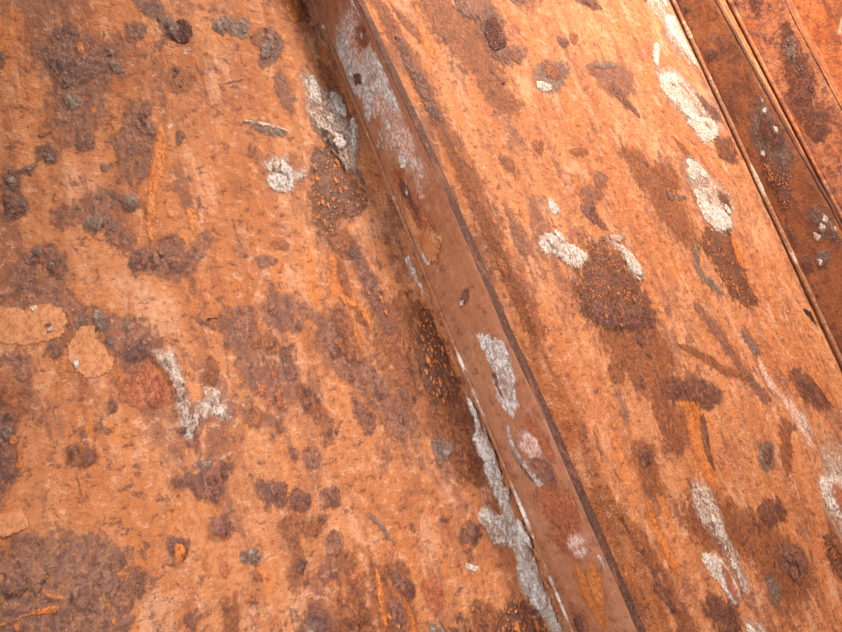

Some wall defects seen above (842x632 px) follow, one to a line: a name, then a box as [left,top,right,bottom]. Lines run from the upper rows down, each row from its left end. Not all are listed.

rust [0,0,214,295]
water stain [299,72,361,169]
water stain [335,0,427,193]
rust [0,512,156,632]
rust [2,241,180,414]
rust [166,459,263,632]
rust [213,141,494,489]
water stain [404,255,423,292]
rust [357,0,646,632]
water stain [465,390,563,632]
rust [571,157,816,632]
water stain [773,386,842,557]